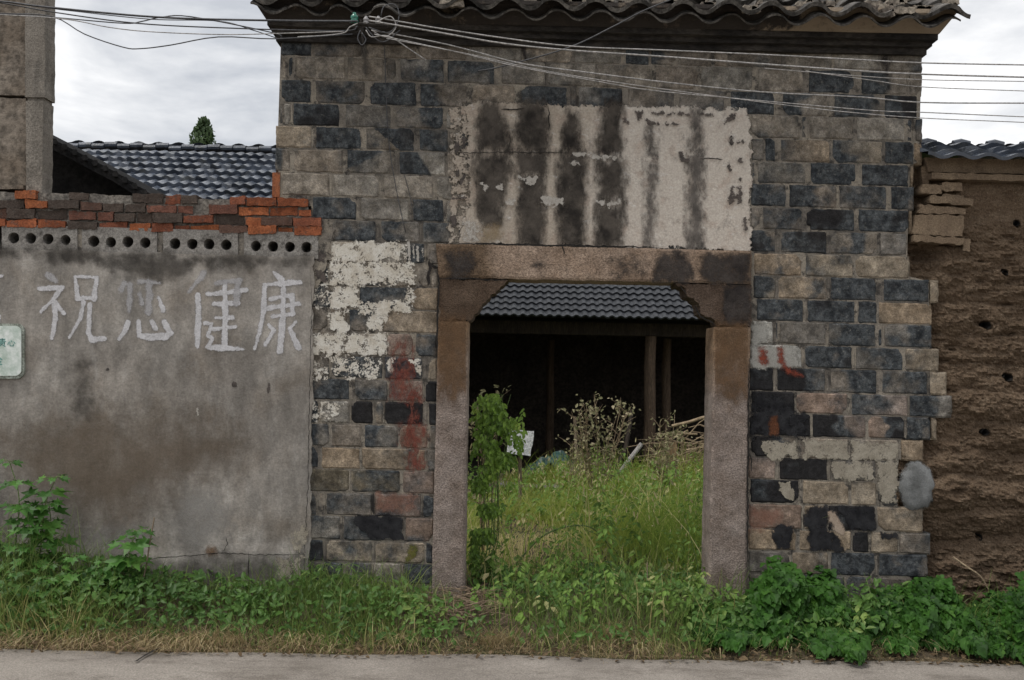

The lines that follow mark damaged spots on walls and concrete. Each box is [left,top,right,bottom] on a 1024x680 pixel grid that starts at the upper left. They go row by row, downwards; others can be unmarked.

flaking render [449,216,483,242]
leakage [472,98,752,325]
peeling [313,239,424,381]
peeling [312,401,344,422]